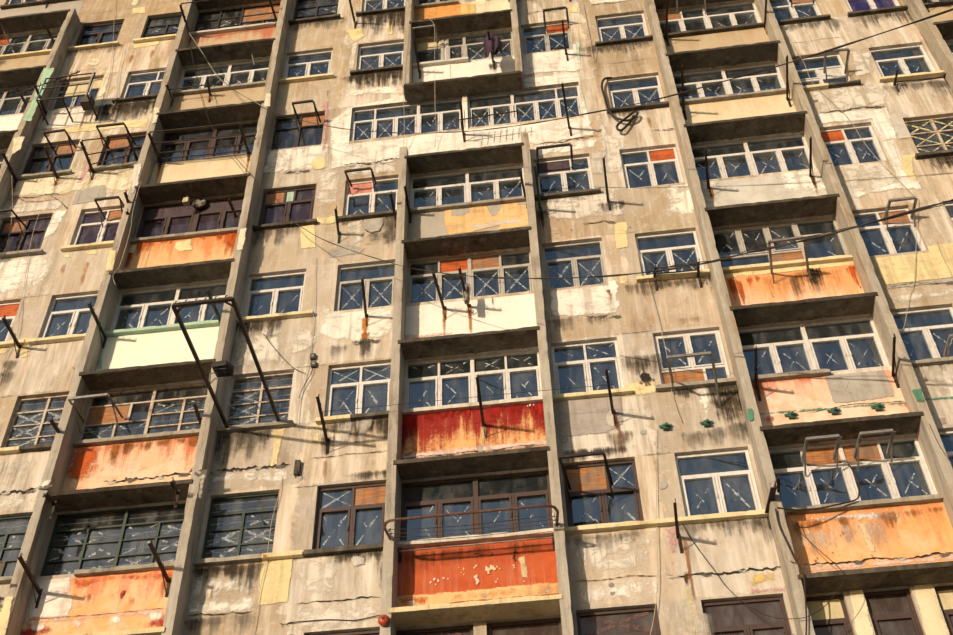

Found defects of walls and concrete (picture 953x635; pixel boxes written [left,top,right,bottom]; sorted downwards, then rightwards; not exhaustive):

peeling [263,43,626,205]
rust [217,232,237,254]
rust [728,276,758,302]
rust [402,409,470,442]
rust [486,402,544,423]
damp [708,384,743,420]
rust [108,436,199,464]
damp [215,429,271,463]
damp [565,431,632,458]
peeling [397,556,559,607]